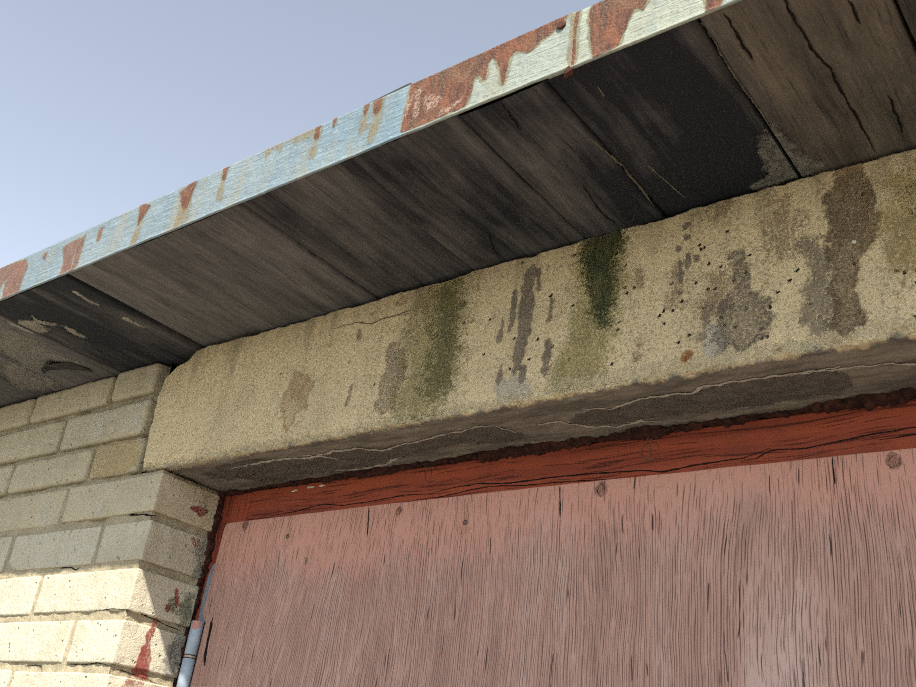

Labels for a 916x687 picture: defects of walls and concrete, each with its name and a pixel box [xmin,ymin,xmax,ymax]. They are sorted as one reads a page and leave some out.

corrosion [704,0,724,12]
crack [724,14,753,61]
corrosion [401,0,649,132]
crack [784,0,875,152]
crack [888,96,902,133]
corrosion [60,235,85,274]
corrosion [130,204,150,245]
corrosion [174,180,198,227]
crack [583,186,617,226]
damp [695,125,916,358]
corrosion [0,259,28,299]